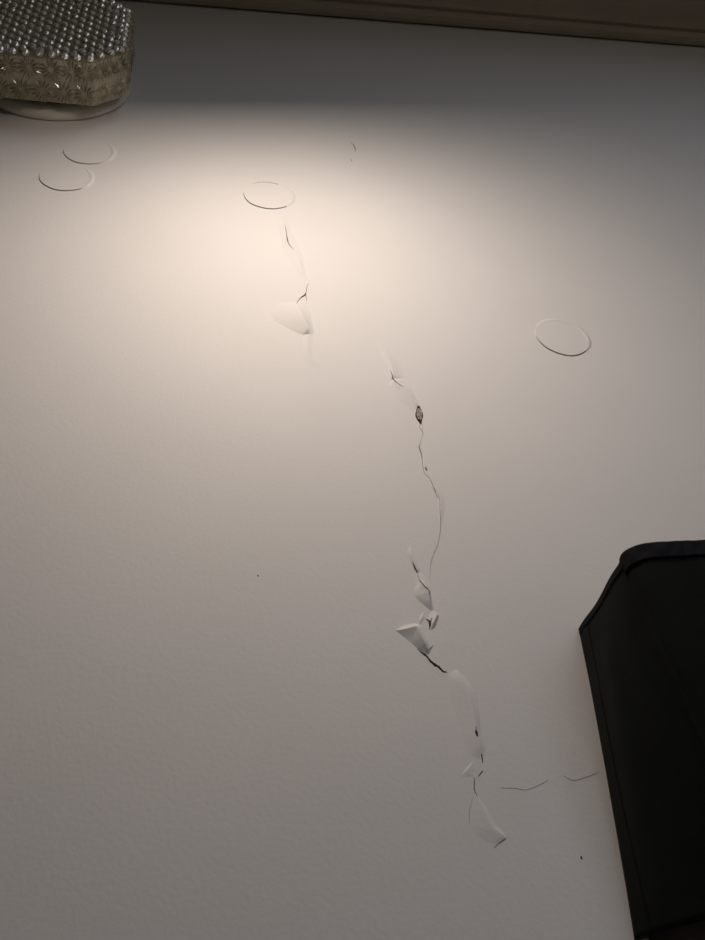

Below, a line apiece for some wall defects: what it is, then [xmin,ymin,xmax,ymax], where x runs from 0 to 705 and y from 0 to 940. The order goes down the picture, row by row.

crack [271,210,321,369]
crack [373,343,507,848]